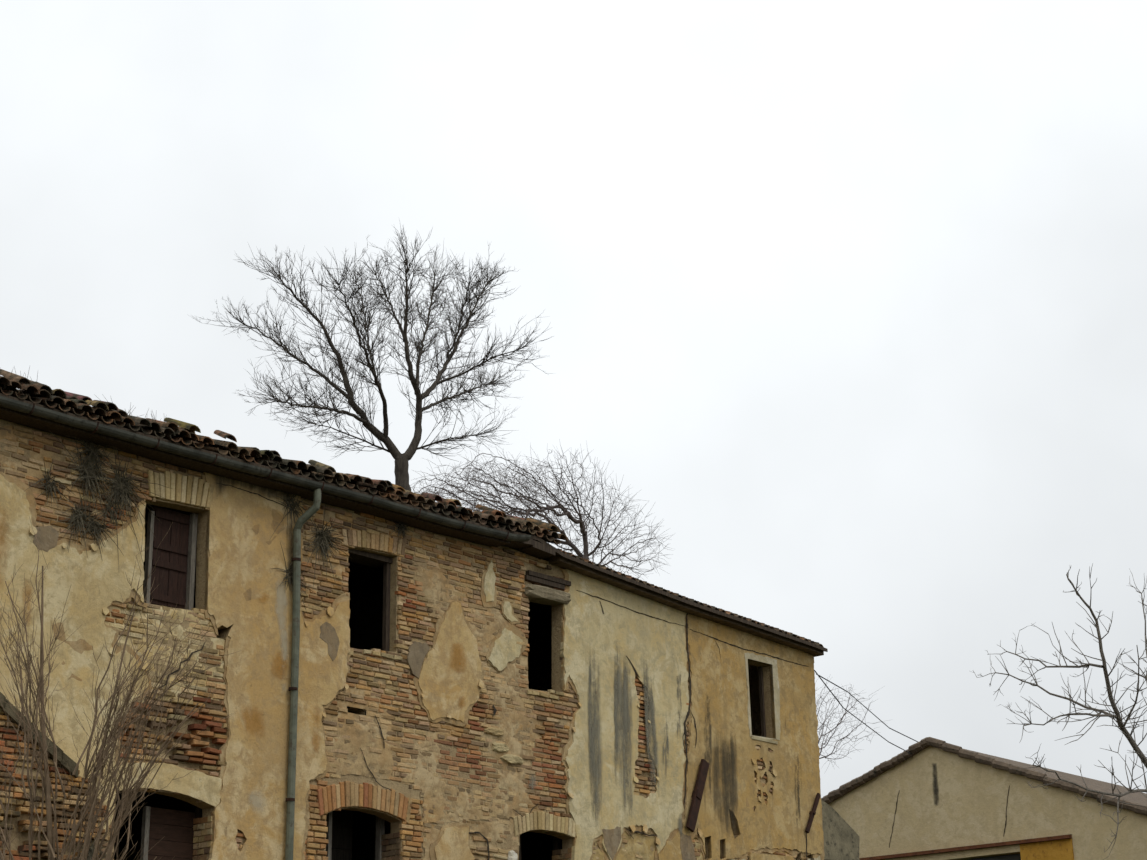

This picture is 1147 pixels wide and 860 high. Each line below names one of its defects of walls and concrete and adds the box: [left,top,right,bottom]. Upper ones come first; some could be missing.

spalling [0,425,201,552]
spalling [102,598,227,777]
spalling [300,499,582,860]
water stain [589,669,602,811]
water stain [614,669,632,805]
spalling [633,671,660,796]
water stain [644,672,680,779]
crack [577,590,809,803]
water stain [705,707,736,813]
spalling [592,824,661,860]
peeling [680,828,703,860]